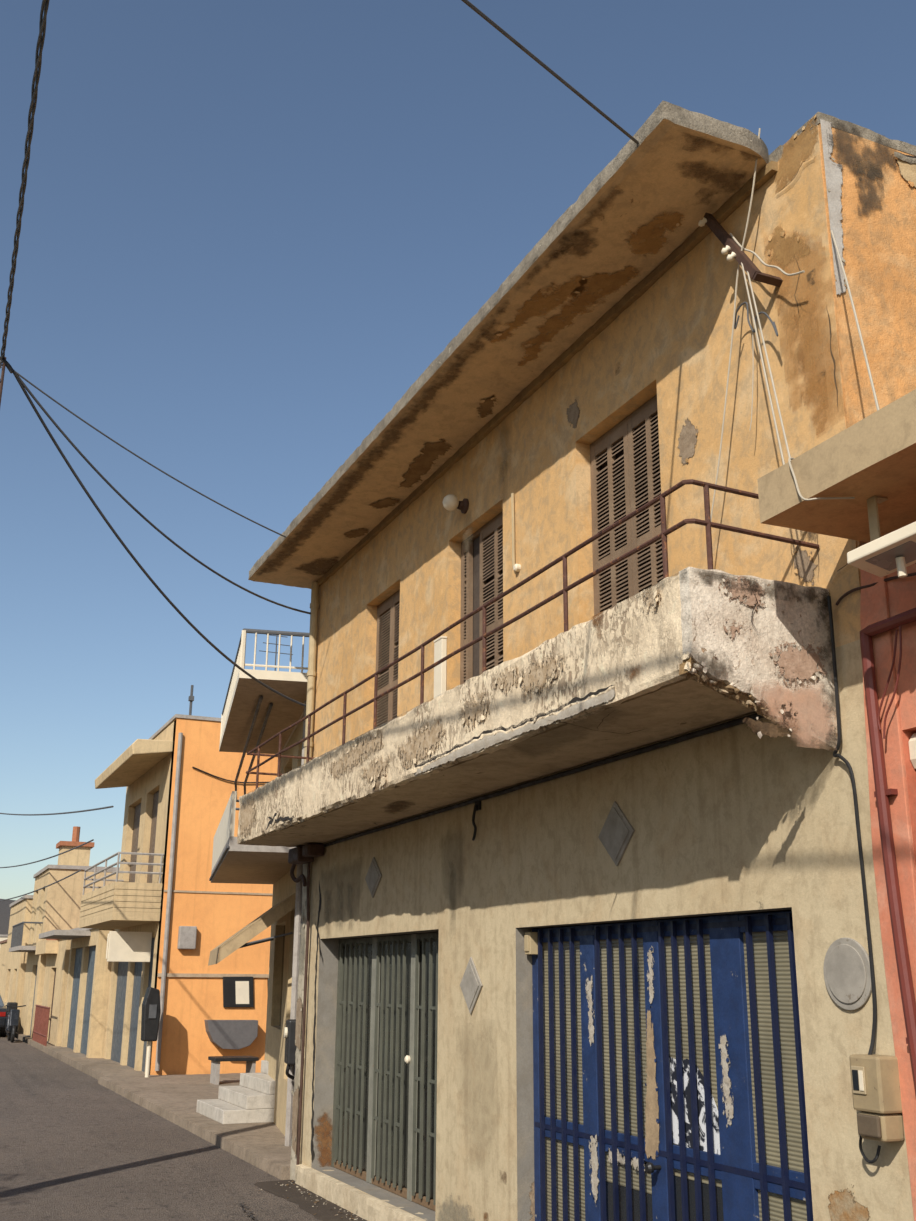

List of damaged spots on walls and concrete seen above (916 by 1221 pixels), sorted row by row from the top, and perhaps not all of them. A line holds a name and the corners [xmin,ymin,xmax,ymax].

water stain [831,121,897,215]
crack [894,152,916,164]
peeling [489,212,684,366]
peeling [368,439,453,509]
peeling [678,417,698,465]
peeling [792,531,818,585]
peeling [718,574,766,642]
peeling [459,651,564,732]
spalling [679,651,799,739]
peeling [769,638,827,688]
peeling [329,719,445,793]
peeling [828,1184,869,1221]